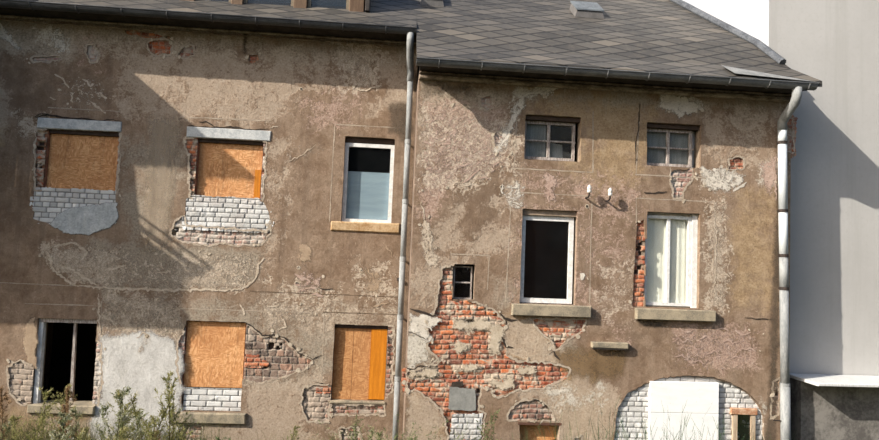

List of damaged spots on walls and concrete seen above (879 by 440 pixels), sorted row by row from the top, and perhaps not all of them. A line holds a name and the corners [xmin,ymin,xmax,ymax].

flaking render [182,136,198,199]
peeling [421,87,558,195]
peeling [499,180,524,209]
flaking render [628,220,645,307]
peeling [660,95,704,118]
peeling [669,155,747,313]
peeling [758,156,778,199]
flaking render [787,115,798,158]
flaking render [5,317,38,406]
peeling [38,215,272,406]
flaking render [239,244,325,384]
flaking render [298,203,587,440]